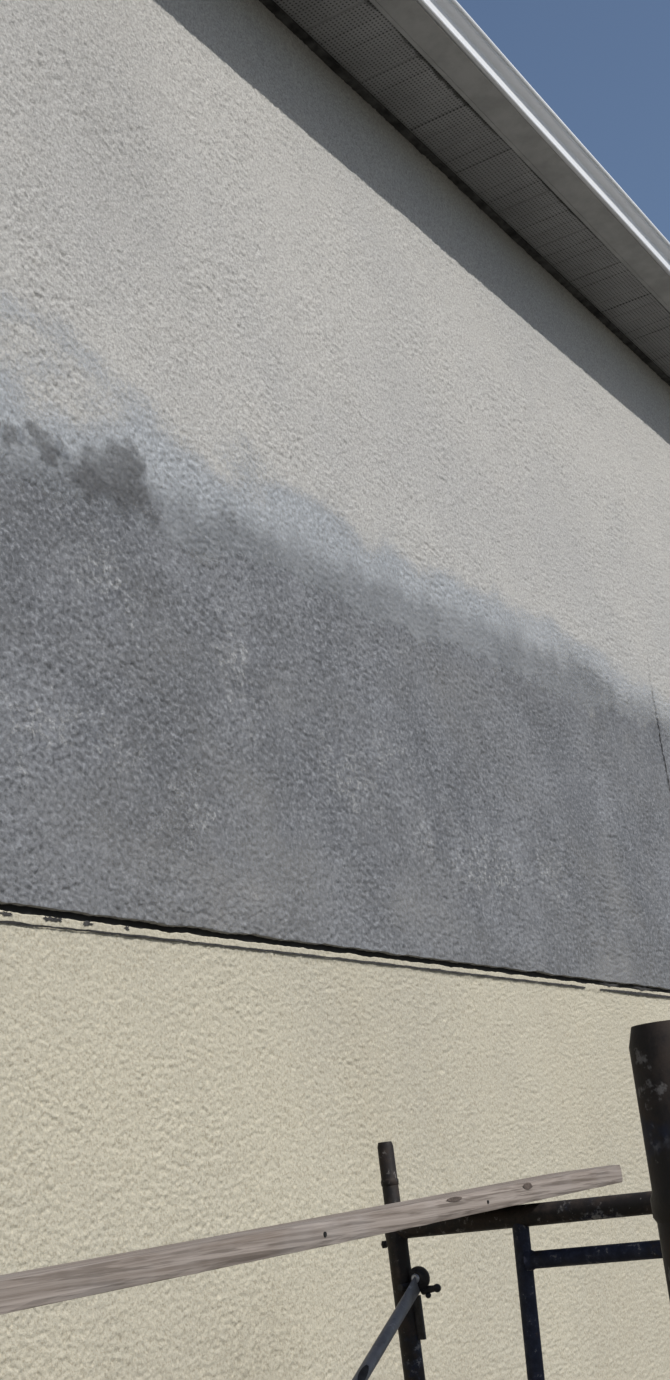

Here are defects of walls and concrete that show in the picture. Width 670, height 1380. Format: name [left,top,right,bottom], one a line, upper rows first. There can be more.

water stain [411,47,497,134]
water stain [528,166,591,232]
water stain [0,396,670,989]